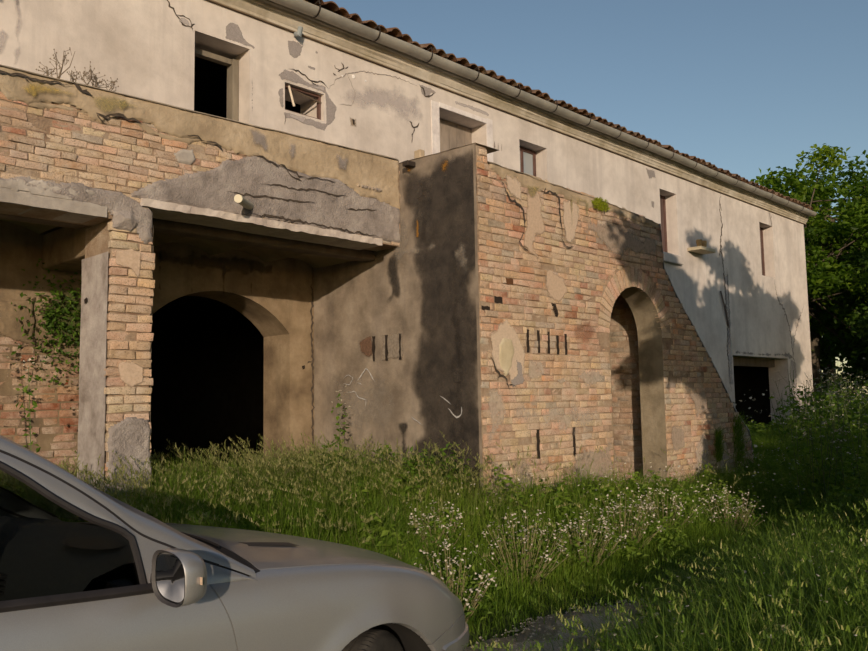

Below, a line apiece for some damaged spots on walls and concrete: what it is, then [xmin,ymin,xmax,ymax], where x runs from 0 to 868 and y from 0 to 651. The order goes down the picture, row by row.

crack [167,0,194,29]
crack [294,69,415,106]
peeling [0,179,97,200]
water stain [388,249,401,296]
crack [719,196,731,383]
water stain [399,154,480,498]
crack [775,286,801,386]